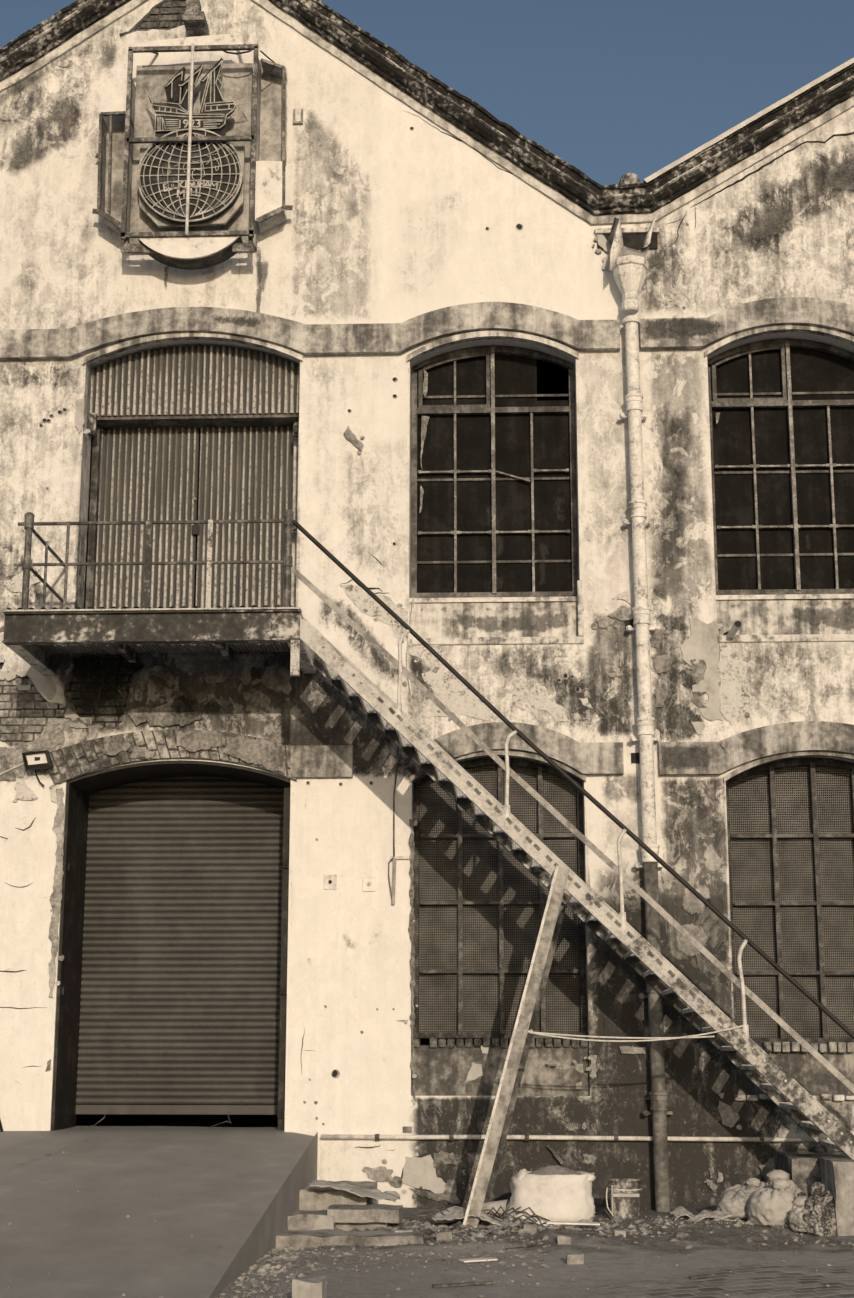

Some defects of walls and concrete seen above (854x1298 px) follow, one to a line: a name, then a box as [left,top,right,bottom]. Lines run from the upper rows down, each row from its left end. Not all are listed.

leakage [0,47,77,100]
leakage [101,47,116,65]
crack [668,132,854,246]
leakage [750,205,792,239]
leakage [645,317,720,339]
leakage [664,441,686,554]
leakage [654,559,667,599]
flaking render [0,644,310,998]